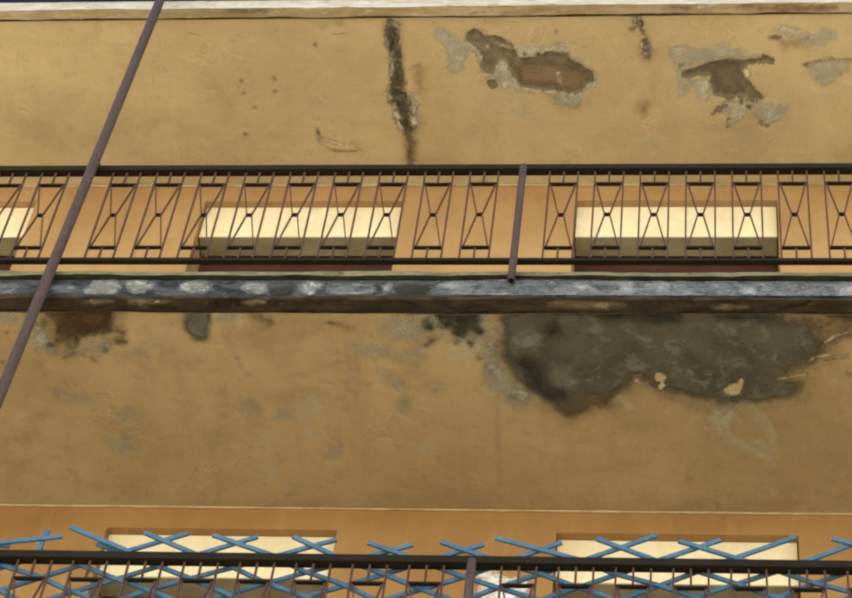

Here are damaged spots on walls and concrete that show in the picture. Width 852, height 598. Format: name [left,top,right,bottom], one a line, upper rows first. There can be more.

crack [630,16,652,58]
crack [384,18,418,164]
spalling [435,27,598,108]
spalling [671,45,788,128]
water stain [84,281,151,294]
water stain [180,282,209,292]
water stain [243,282,321,295]
water stain [184,313,211,341]
water stain [352,301,852,416]